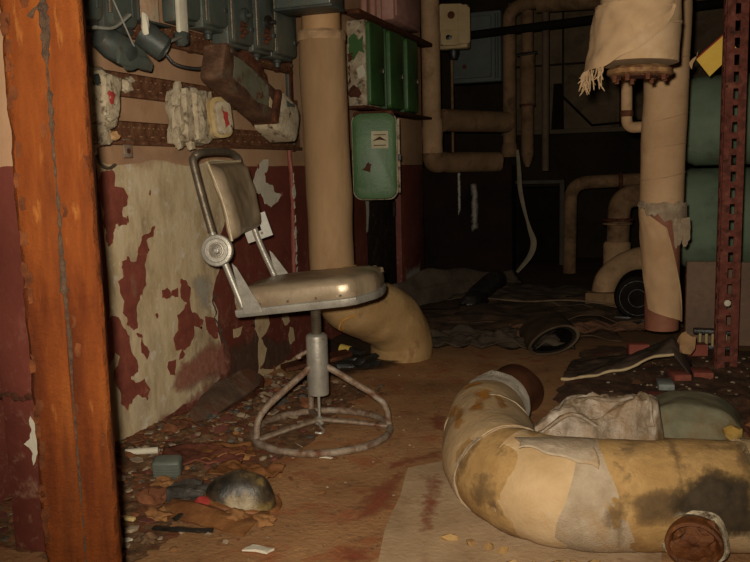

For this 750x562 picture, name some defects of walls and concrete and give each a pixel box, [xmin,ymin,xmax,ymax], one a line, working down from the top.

rust [0,10,18,110]
peeling [253,159,283,207]
peeling [96,159,230,441]
peeling [254,313,296,376]
rust [0,391,46,470]
peeling [24,417,38,465]